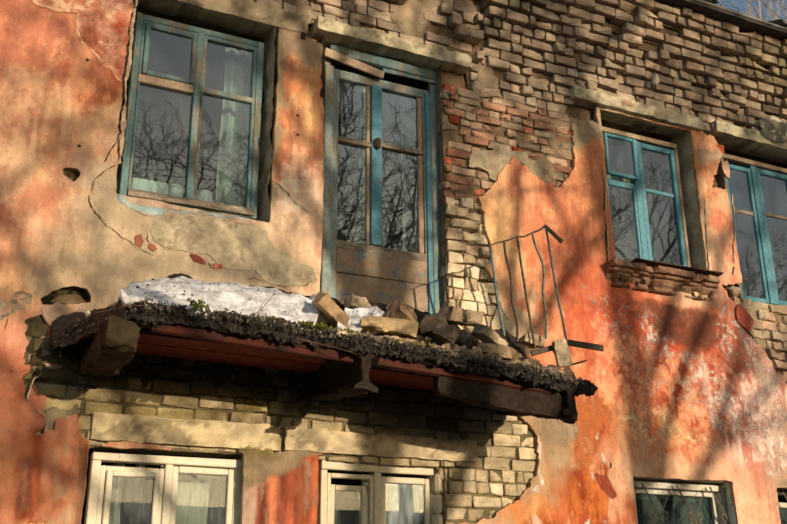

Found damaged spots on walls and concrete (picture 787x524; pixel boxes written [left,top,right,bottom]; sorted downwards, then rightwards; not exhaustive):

spalling [63,168,80,181]
peeling [32,0,136,82]
flaking render [118,94,127,164]
crack [88,0,219,271]
spalling [250,0,787,368]
spalling [0,287,537,524]
damp [589,296,787,479]
spalling [727,286,787,384]